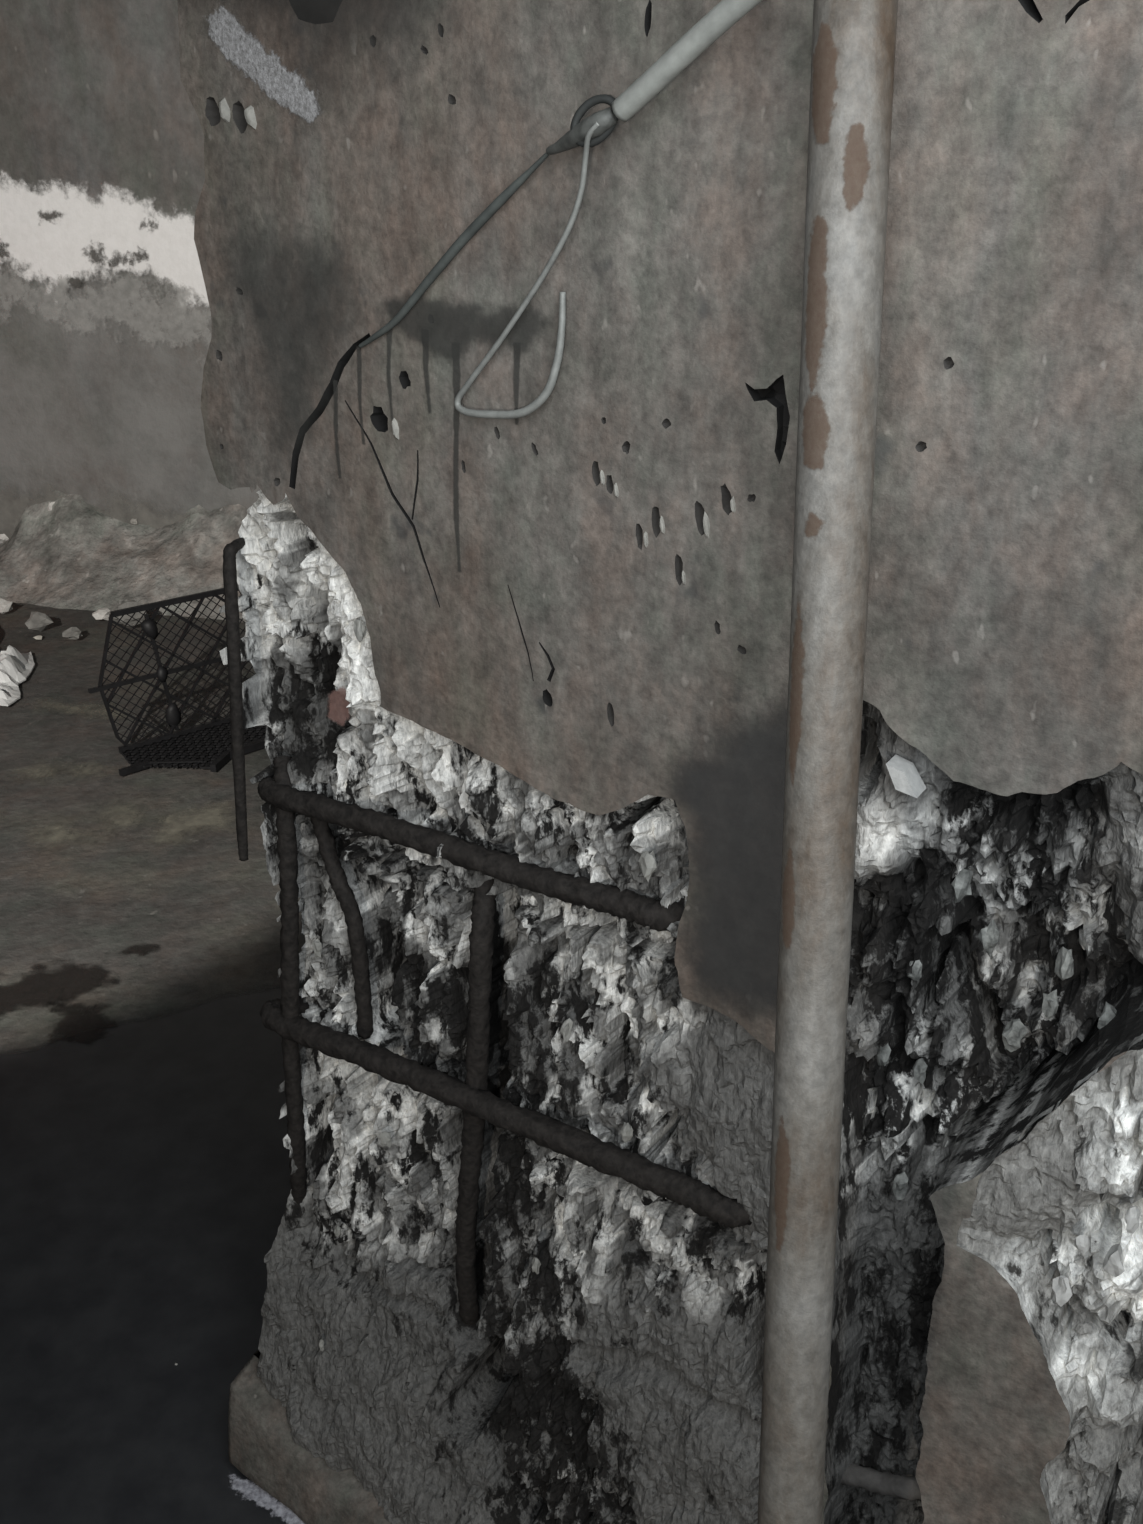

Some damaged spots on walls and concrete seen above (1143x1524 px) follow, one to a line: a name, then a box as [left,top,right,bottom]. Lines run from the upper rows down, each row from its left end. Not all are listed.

corrosion [812,24,837,143]
corrosion [843,123,870,210]
corrosion [803,215,830,469]
crack [289,333,440,608]
spalling [592,461,619,497]
corrosion [805,512,822,536]
spalling [219,483,775,1524]
spalling [823,700,1143,1524]